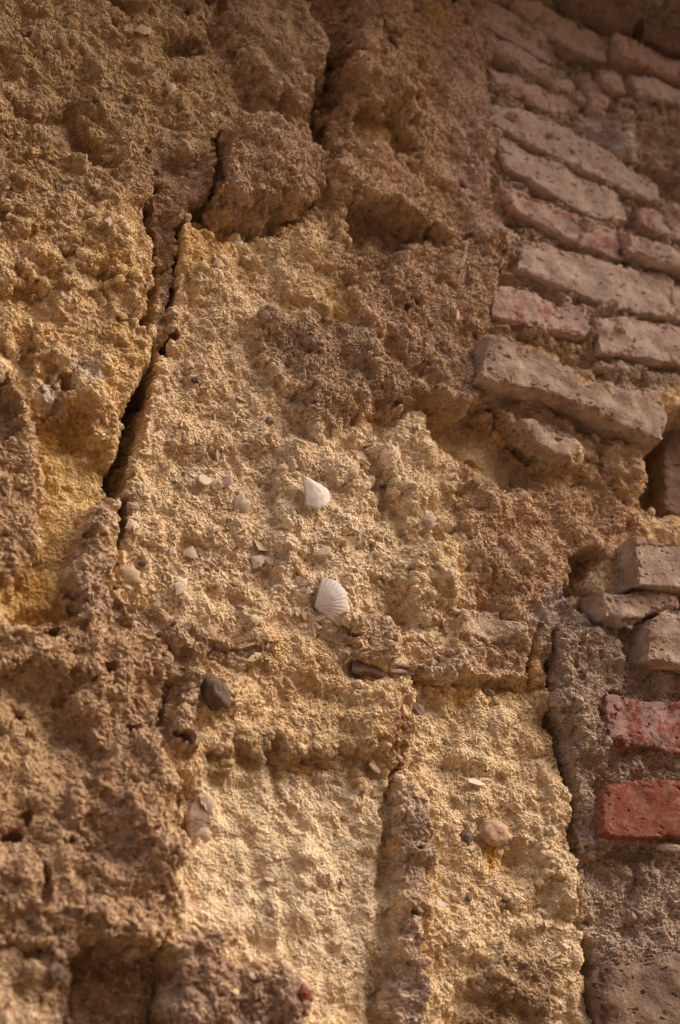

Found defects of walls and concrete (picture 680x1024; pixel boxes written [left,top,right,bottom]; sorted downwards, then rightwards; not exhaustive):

crack [101,128,234,590]
crack [510,618,596,971]